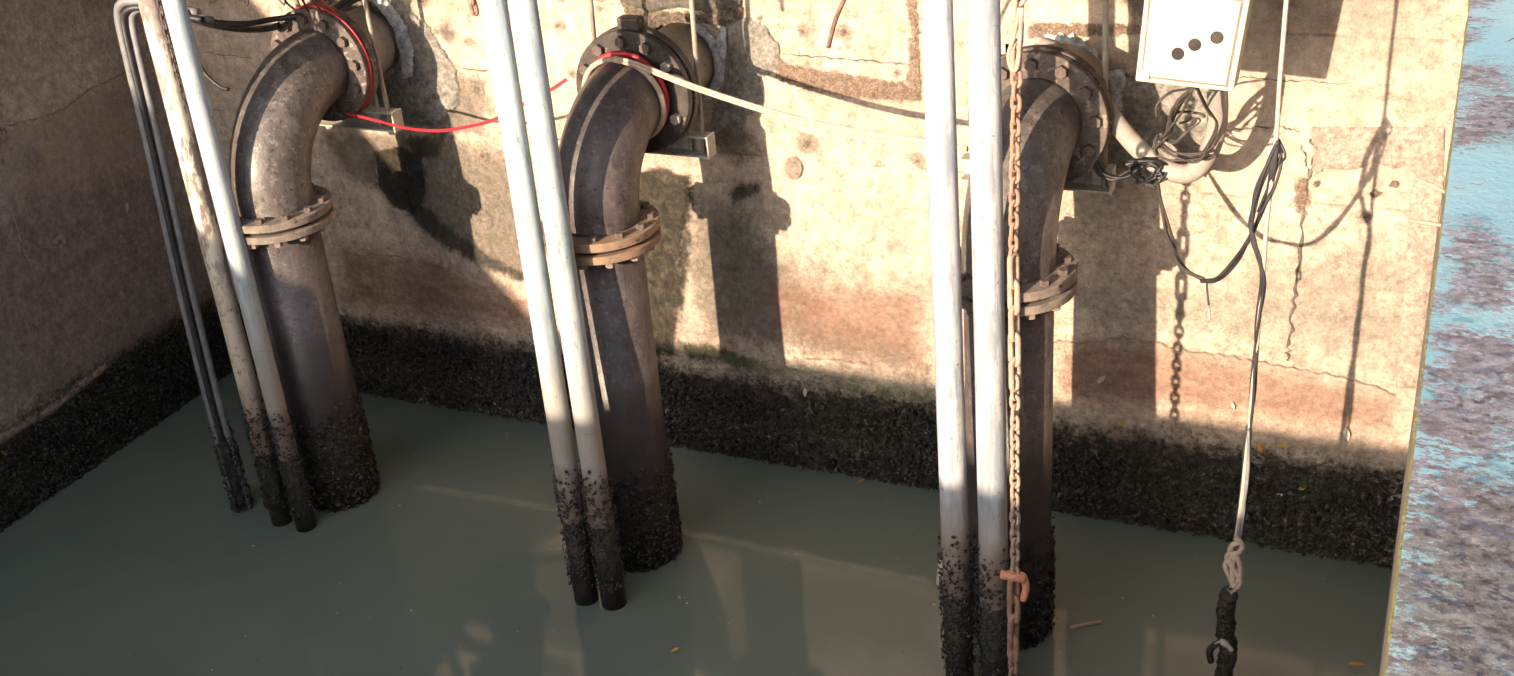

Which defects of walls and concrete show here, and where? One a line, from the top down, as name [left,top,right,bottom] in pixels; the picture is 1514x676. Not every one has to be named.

crack [1240,76,1348,85]
crack [1233,126,1314,361]